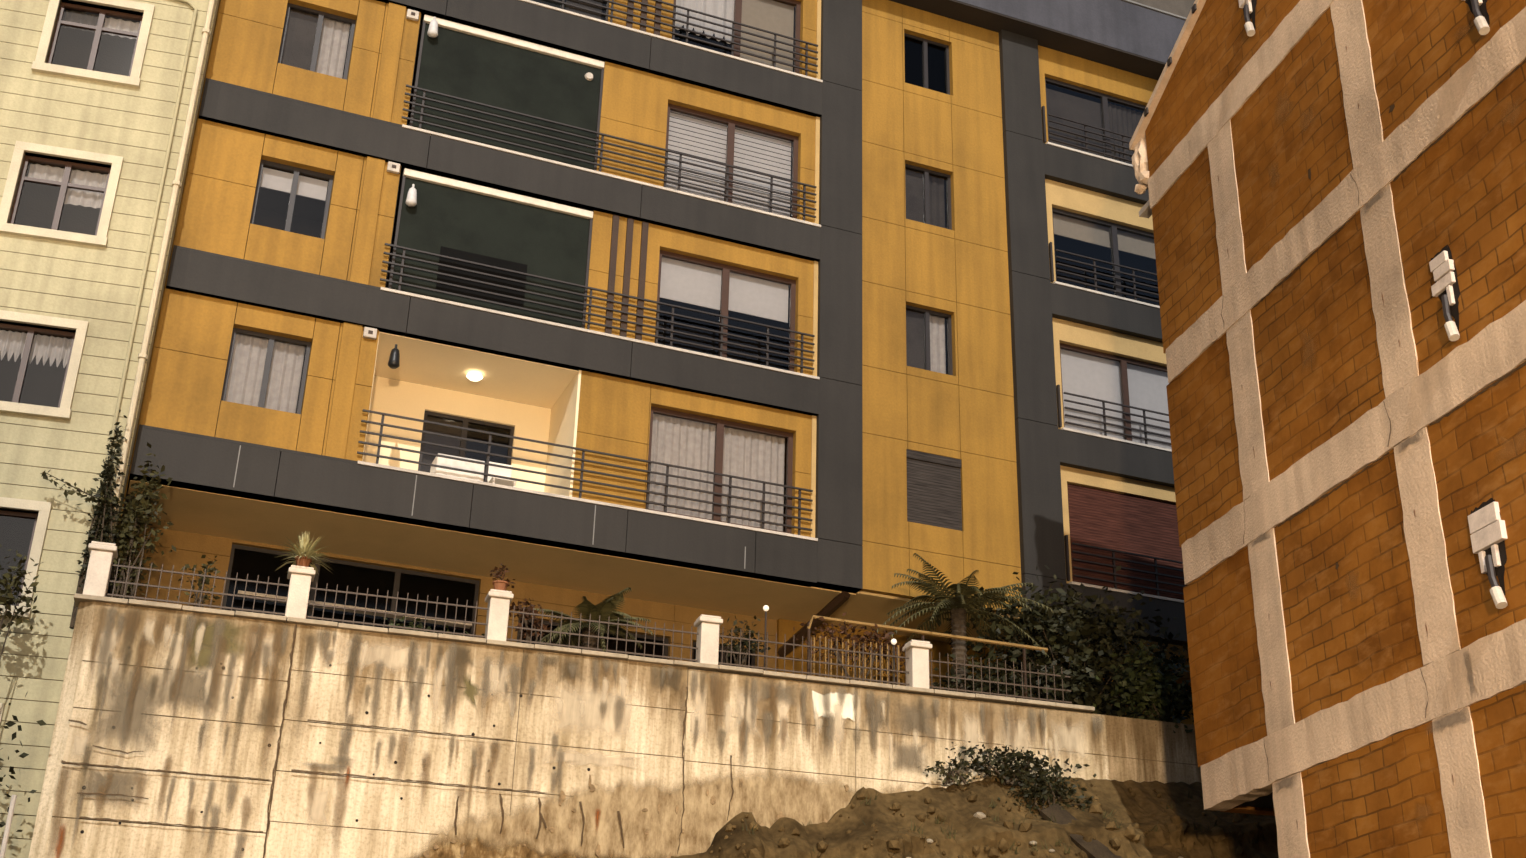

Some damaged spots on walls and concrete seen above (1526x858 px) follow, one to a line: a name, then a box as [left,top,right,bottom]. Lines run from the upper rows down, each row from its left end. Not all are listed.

damp [93,608,288,741]
damp [303,632,630,828]
damp [653,668,1103,774]
damp [54,739,249,858]